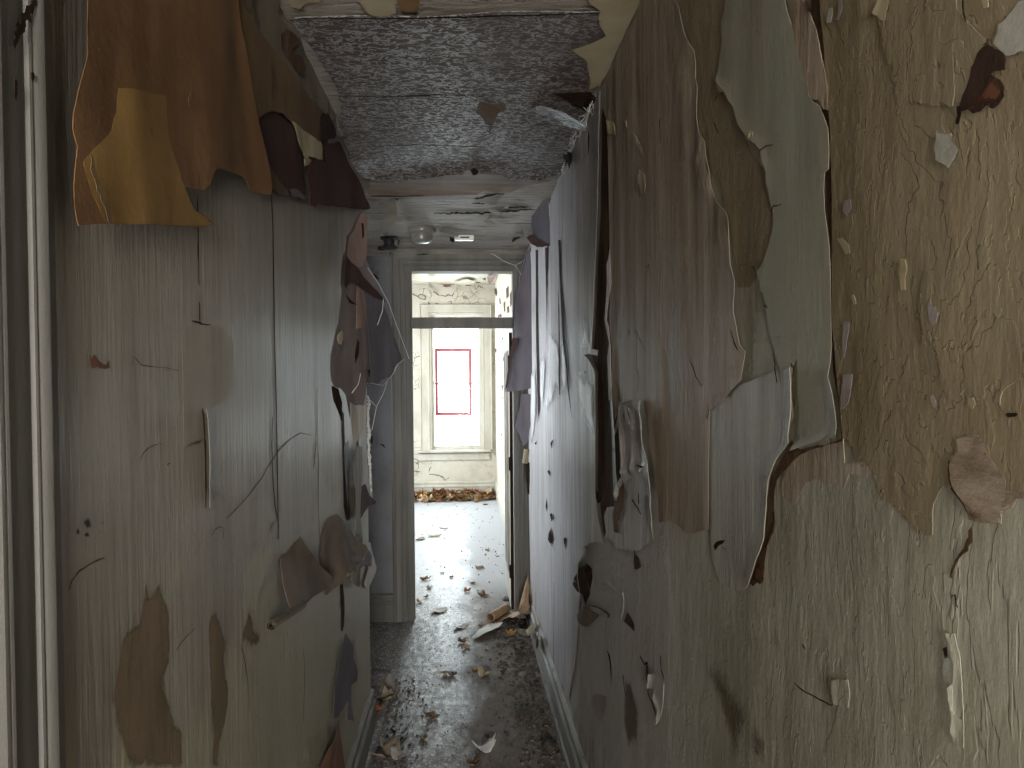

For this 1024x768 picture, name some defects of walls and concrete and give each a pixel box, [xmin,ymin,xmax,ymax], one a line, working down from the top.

peeling [872,0,1024,107]
crack [434,193,534,215]
peeling [678,0,853,451]
peeling [530,334,566,440]
peeling [947,434,1024,523]